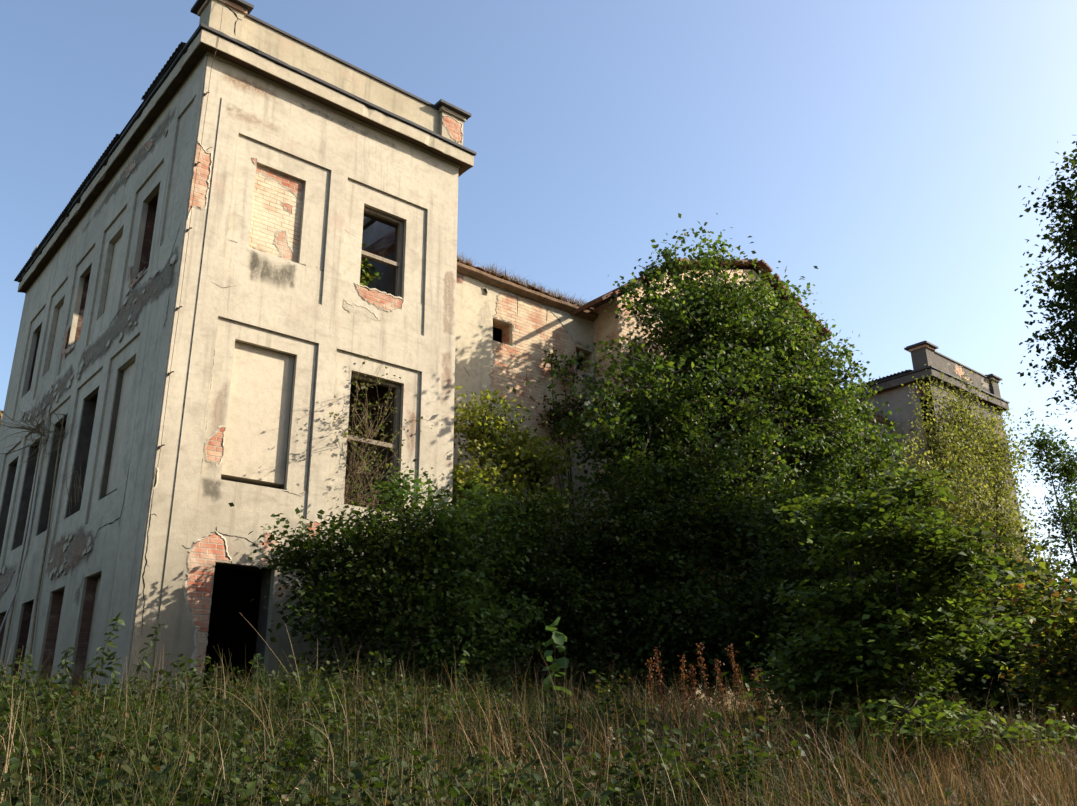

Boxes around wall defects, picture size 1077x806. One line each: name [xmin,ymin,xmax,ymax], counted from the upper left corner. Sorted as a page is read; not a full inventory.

flaking render [442,115,463,144]
flaking render [187,140,213,220]
flaking render [251,157,304,215]
flaking render [272,230,296,262]
flaking render [20,247,177,422]
flaking render [342,283,405,323]
flaking render [488,292,586,450]
flaking render [203,395,226,466]
flaking render [47,527,94,580]
flaking render [182,530,232,675]